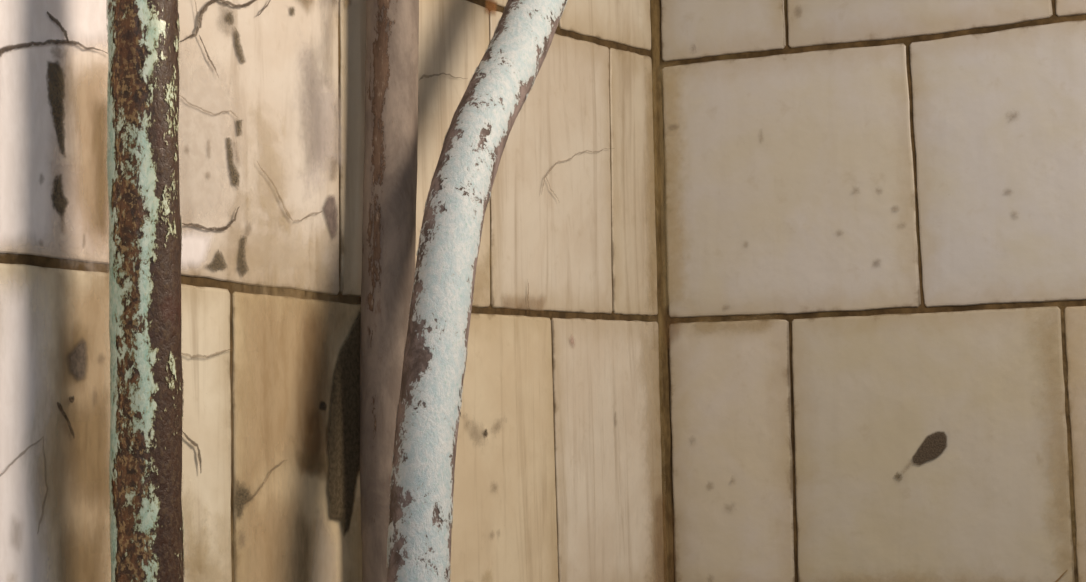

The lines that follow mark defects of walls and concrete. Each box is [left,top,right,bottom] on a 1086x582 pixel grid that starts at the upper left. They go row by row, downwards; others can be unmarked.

crack [0,11,108,57]
crack [179,0,271,78]
corrosion [363,0,398,312]
crack [182,206,240,231]
peeling [387,0,568,582]